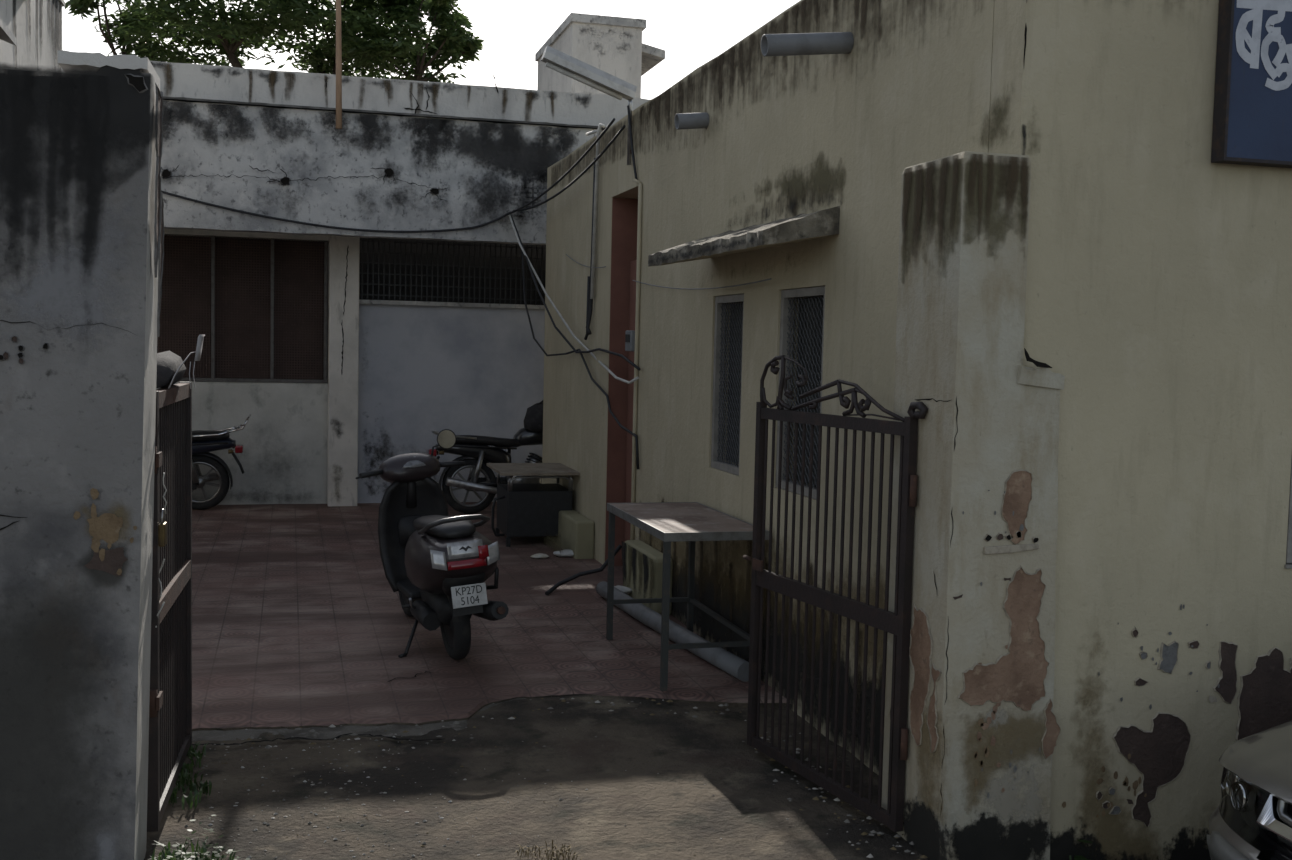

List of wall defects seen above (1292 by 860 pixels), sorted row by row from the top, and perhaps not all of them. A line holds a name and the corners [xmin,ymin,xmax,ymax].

damp [0,0,308,252]
damp [322,0,881,225]
damp [902,101,1028,281]
spalling [73,488,137,585]
damp [0,601,90,860]
peeling [909,604,942,753]
peeling [957,469,1061,798]
damp [903,710,1211,860]
peeling [1096,704,1191,827]
peeling [1118,623,1292,741]